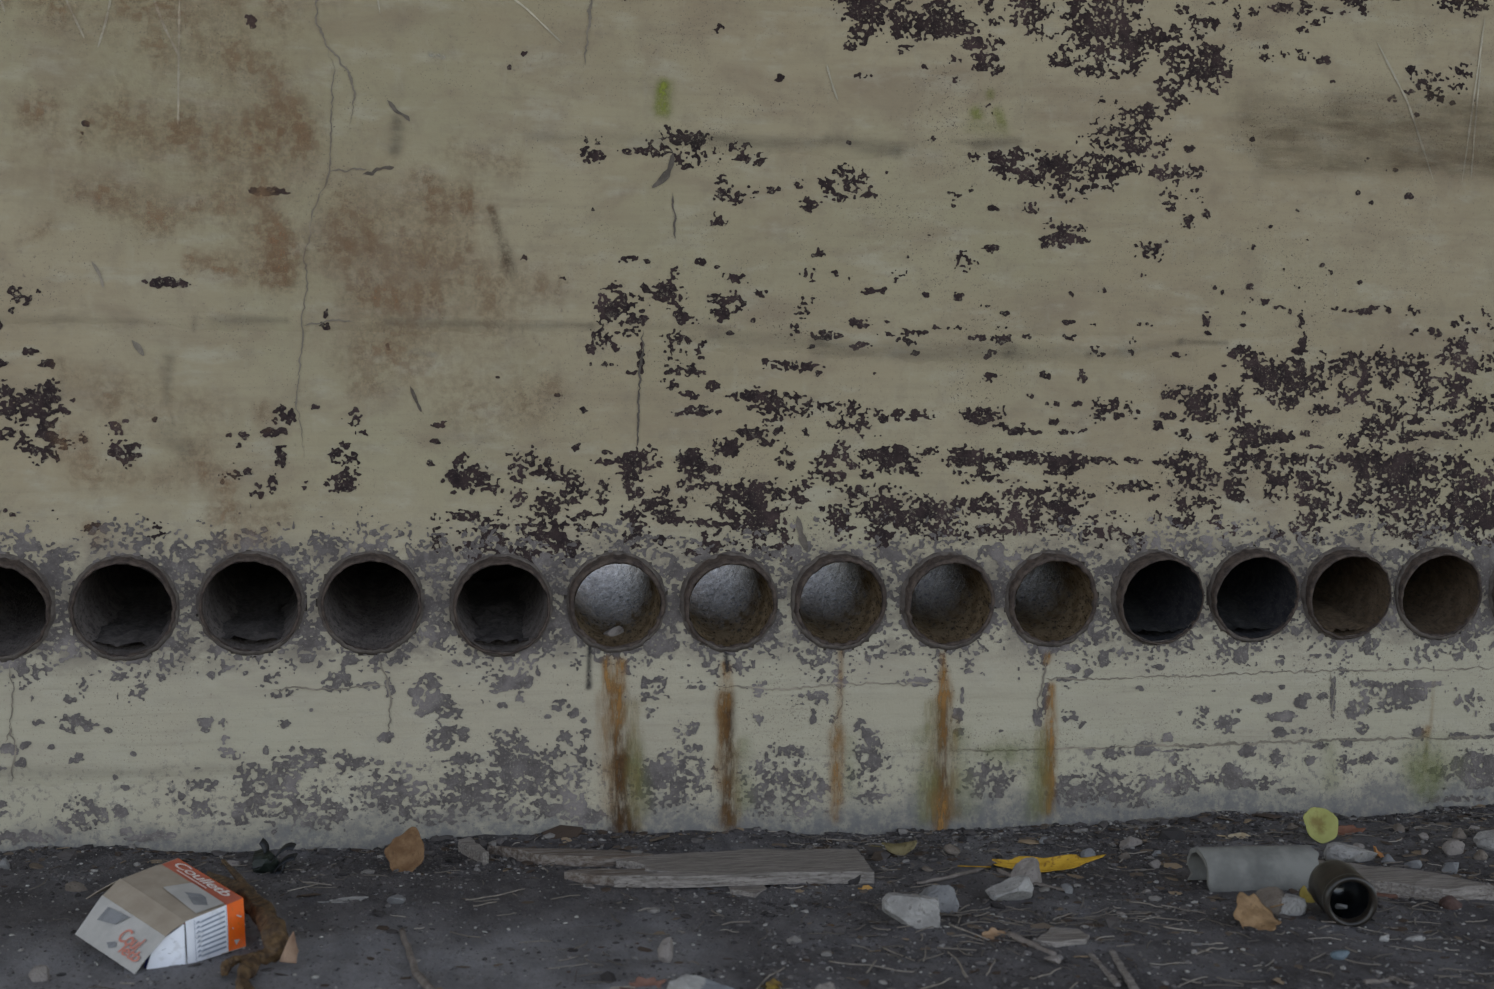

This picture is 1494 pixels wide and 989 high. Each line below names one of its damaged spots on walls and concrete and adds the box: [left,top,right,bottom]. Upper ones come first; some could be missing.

peeling [1432,0,1490,19]
peeling [248,186,291,196]
crack [295,0,410,449]
peeling [580,124,888,226]
peeling [831,0,1369,249]
peeling [1387,62,1475,117]
peeling [0,239,1494,846]
corrosion [604,659,631,832]
corrosion [719,692,734,824]
corrosion [928,670,951,830]
corrosion [1039,684,1055,811]